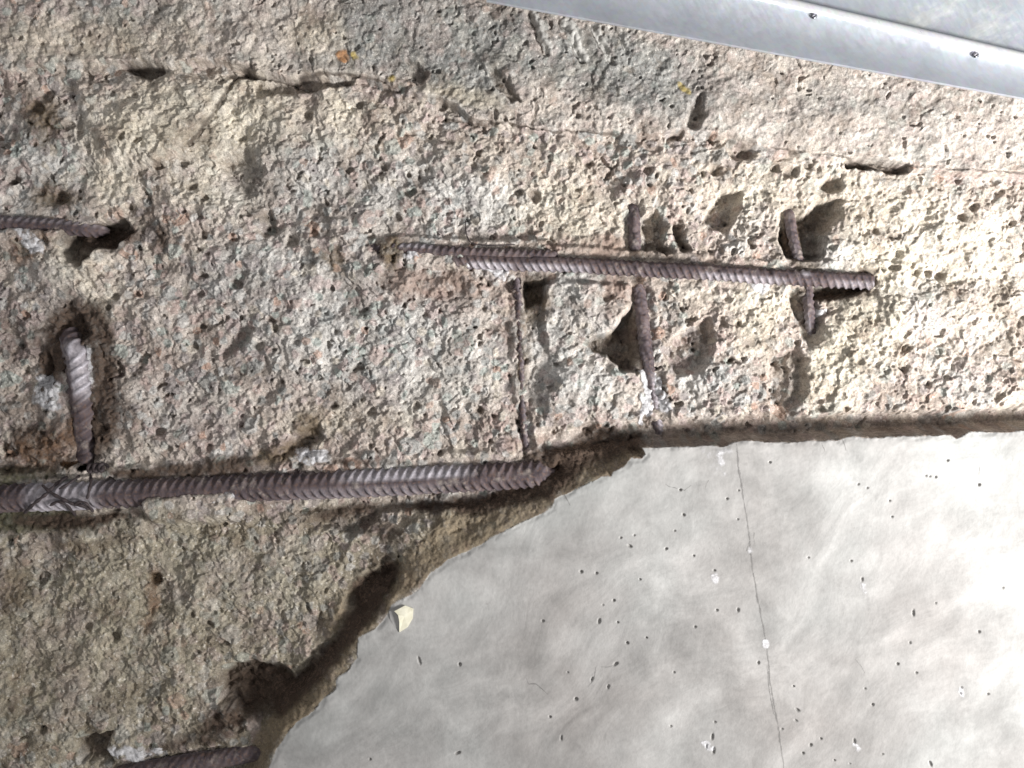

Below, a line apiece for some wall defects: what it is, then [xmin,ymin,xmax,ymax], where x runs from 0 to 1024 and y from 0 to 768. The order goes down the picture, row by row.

crack [188,71,384,145]
spalling [0,0,1024,173]
corrosion [781,224,802,260]
spalling [0,57,1024,514]
corrosion [813,288,869,302]
corrosion [38,300,121,457]
corrosion [0,417,77,486]
corrosion [110,417,317,480]
corrosion [0,510,130,532]
spalling [0,460,555,768]